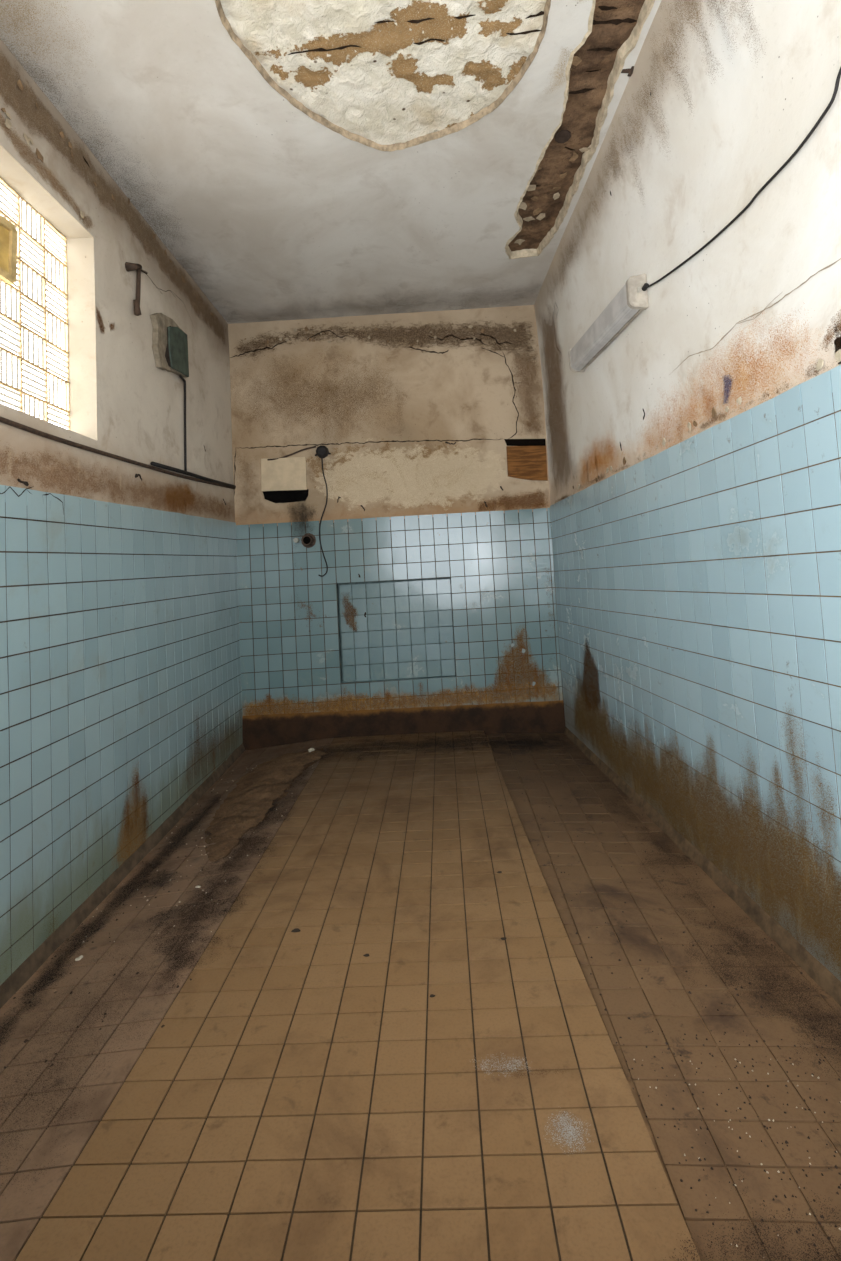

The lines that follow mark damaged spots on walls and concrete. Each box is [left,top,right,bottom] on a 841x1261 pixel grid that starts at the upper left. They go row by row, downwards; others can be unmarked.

water stain [0,343,510,525]
peeling [0,51,537,362]
crack [234,348,521,495]
spalling [215,0,551,152]
water stain [0,0,767,495]
spalling [505,0,655,259]
rust [577,303,841,490]
crack [669,258,841,375]
water stain [739,702,838,902]